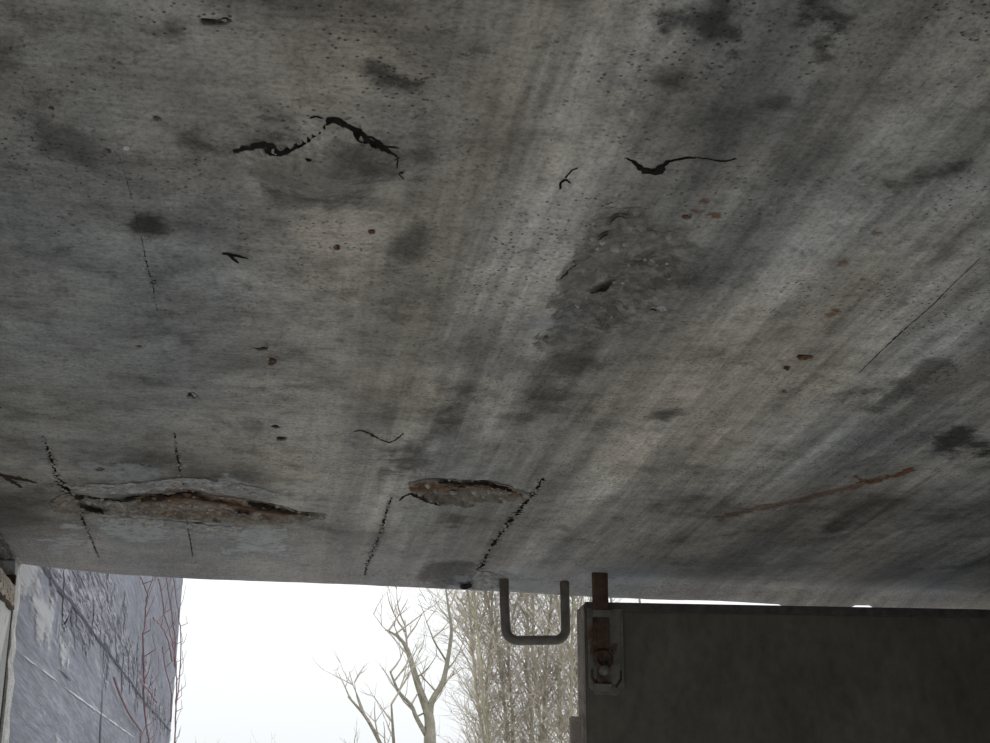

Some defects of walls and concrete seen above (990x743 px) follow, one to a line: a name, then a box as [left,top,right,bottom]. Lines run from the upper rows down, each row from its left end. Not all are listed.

water stain [660,12,739,40]
crack [233,116,405,180]
crack [559,168,578,190]
crack [626,157,737,175]
crack [173,431,187,492]
crack [353,430,404,443]
water stain [935,426,990,459]
crack [0,436,99,557]
spalling [49,478,326,524]
crack [361,493,441,575]
spalling [408,478,528,508]
crack [475,478,547,570]